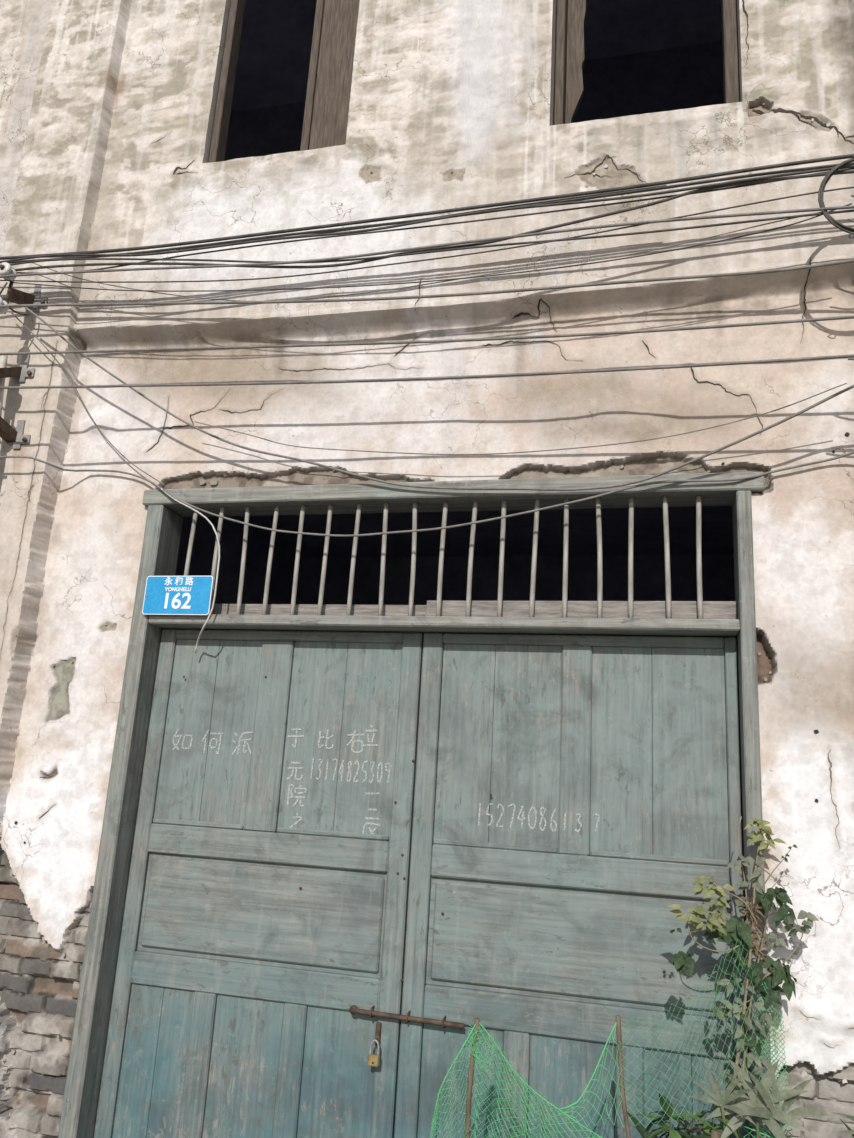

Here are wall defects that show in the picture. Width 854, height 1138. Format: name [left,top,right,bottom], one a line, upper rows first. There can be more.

crack [752,108,854,143]
flaking render [572,150,645,190]
crack [483,298,577,361]
crack [800,257,811,344]
crack [147,279,428,451]
crack [691,367,763,429]
flaking render [155,464,438,490]
flaking render [756,622,779,686]
flaking render [43,655,78,725]
flaking render [0,830,94,1138]
flaking render [773,1054,854,1138]